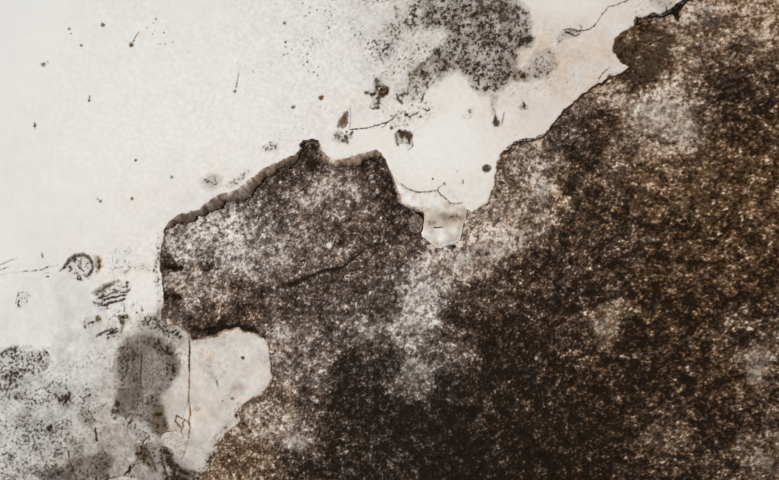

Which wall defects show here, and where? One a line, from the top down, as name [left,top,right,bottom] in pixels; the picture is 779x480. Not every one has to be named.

crack [567,0,687,36]
water stain [364,0,557,146]
spalling [159,0,779,480]
water stain [84,281,130,328]
water stain [0,346,49,400]
water stain [56,391,73,408]
crack [105,329,191,480]
water stain [96,314,227,480]
water stain [0,419,112,480]